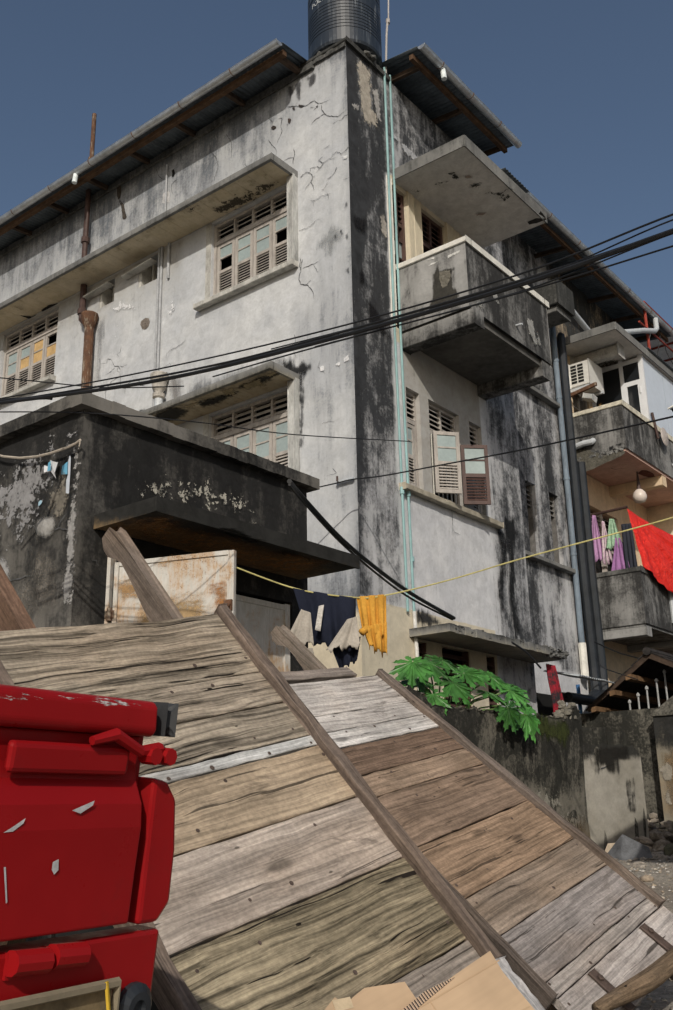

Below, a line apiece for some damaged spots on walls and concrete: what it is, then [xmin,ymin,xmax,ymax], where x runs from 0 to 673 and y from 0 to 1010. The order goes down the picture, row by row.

peeling [352,61,381,127]
water stain [213,182,278,213]
crack [268,101,348,231]
rust [175,600,203,618]
water stain [498,517,519,639]
water stain [584,746,629,773]